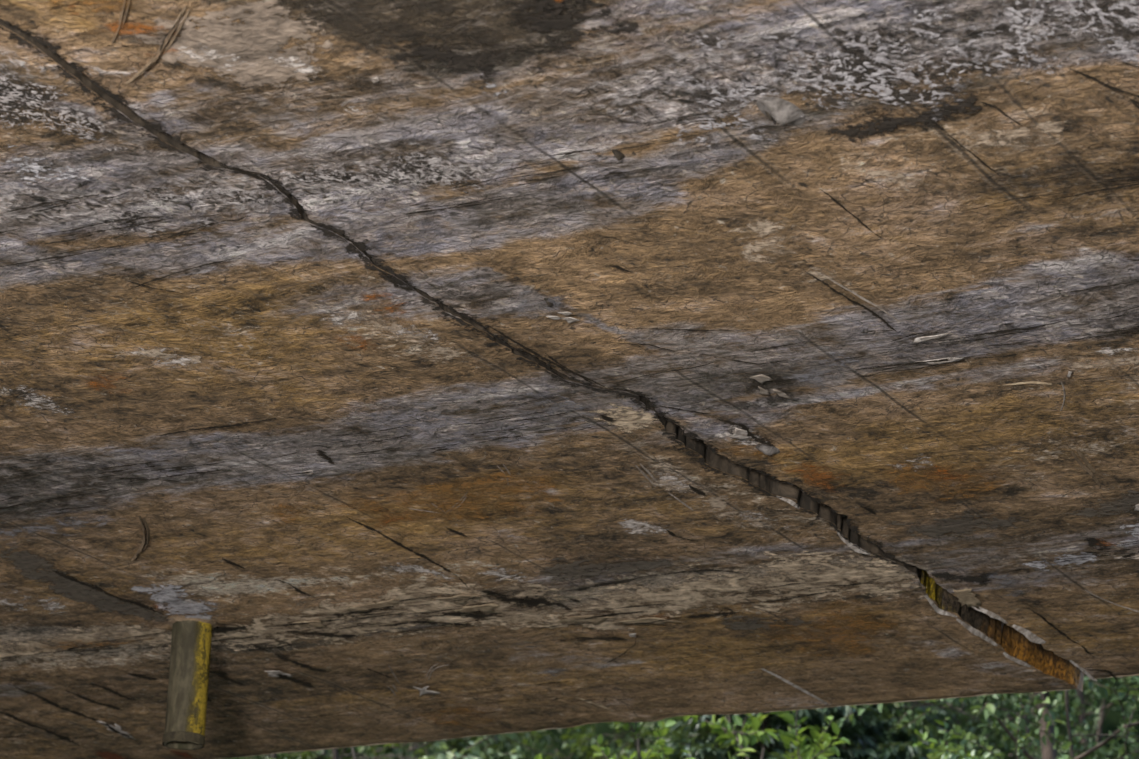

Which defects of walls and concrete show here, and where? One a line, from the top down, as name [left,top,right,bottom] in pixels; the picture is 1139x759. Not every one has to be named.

leakage [106,0,638,96]
leakage [286,0,1139,217]
crack [982,102,1021,125]
crack [1069,61,1139,109]
leakage [0,185,273,267]
crack [0,13,919,587]
crack [1055,259,1139,294]
crack [48,568,160,613]
crack [556,569,748,610]
crack [688,608,742,619]
crack [921,569,1117,692]
crack [207,644,327,702]